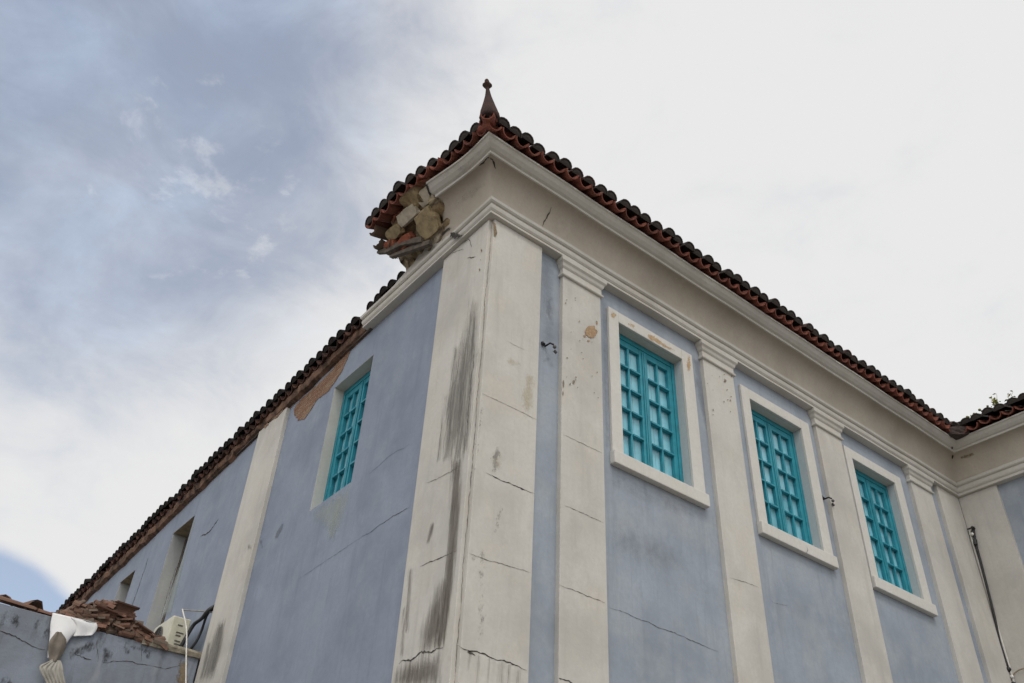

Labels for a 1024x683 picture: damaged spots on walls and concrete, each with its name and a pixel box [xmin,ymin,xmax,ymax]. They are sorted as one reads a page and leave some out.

flaking render [384,177,450,271]
flaking render [264,352,350,428]
leakage [447,321,475,451]
crack [402,226,535,683]
leakage [424,461,460,647]
leakage [396,661,438,683]